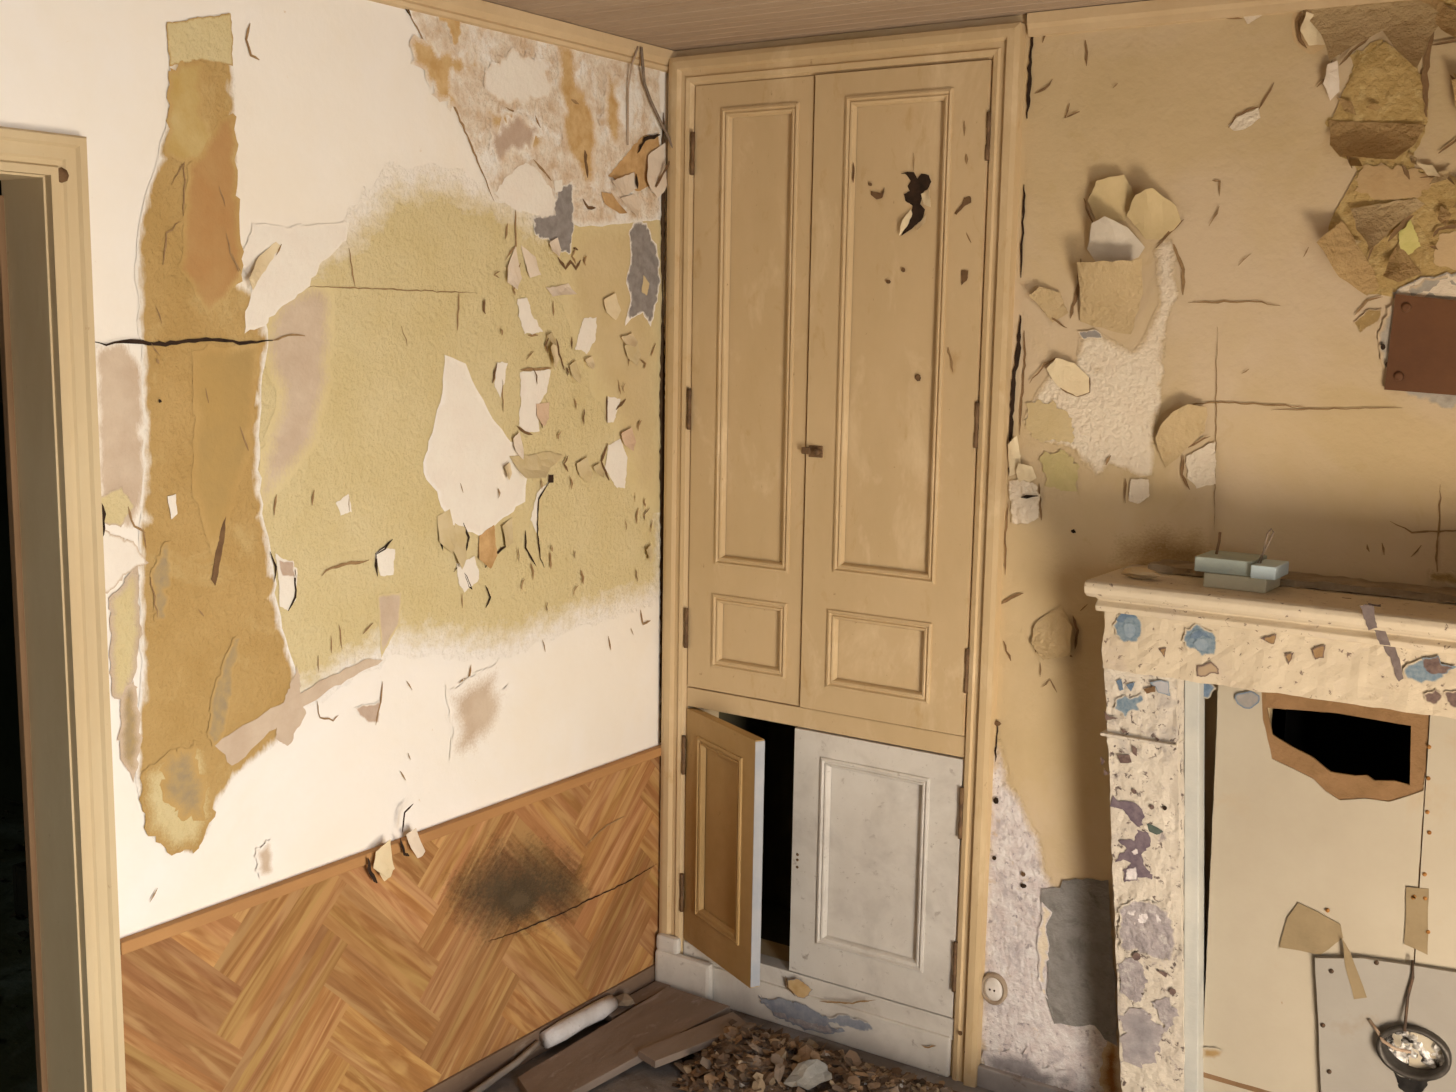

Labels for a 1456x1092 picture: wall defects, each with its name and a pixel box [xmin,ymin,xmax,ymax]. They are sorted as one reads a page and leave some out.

peeling [899,153,931,236]
peeling [955,196,971,215]
crack [95,334,305,356]
peeling [215,9,667,765]
spalling [1008,175,1216,525]
peeling [168,494,177,519]
peeling [95,336,149,782]
peeling [1100,679,1170,775]
peeling [254,840,275,879]
damp [460,854,575,922]
peeling [958,721,1179,1092]
peeling [758,976,877,1034]